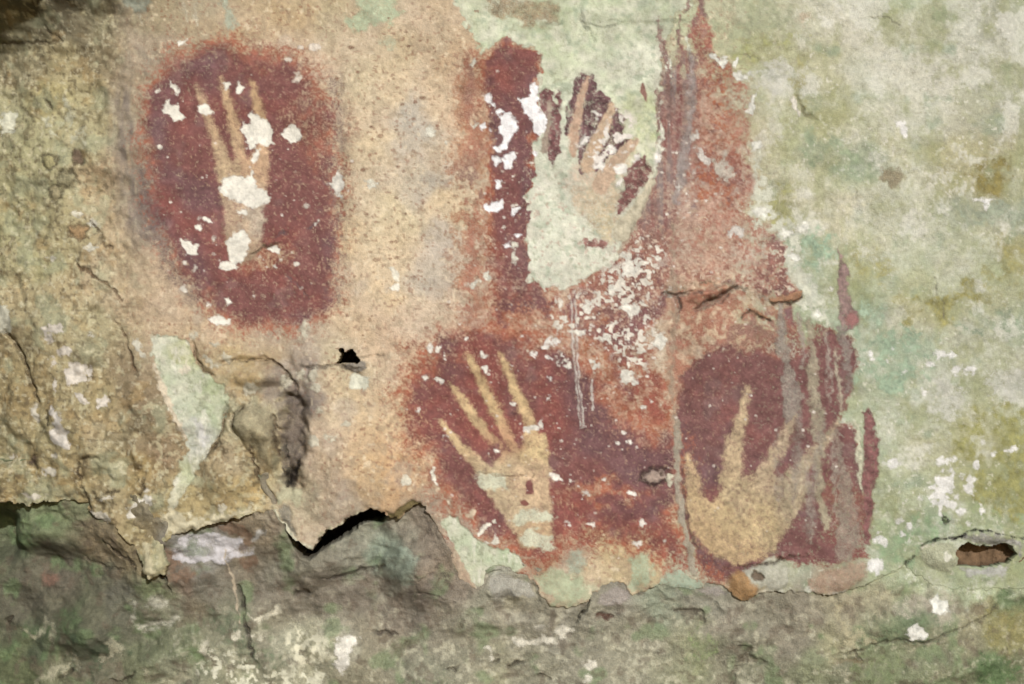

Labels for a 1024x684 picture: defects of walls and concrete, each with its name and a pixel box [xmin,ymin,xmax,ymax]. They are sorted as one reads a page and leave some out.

peeling [155,81,186,121]
peeling [197,103,215,115]
peeling [180,111,303,283]
peeling [326,169,349,200]
peeling [453,0,834,406]
peeling [206,297,232,326]
leakage [438,0,913,577]
leakage [920,348,1024,435]
peeling [509,402,562,442]
crack [865,528,1024,586]